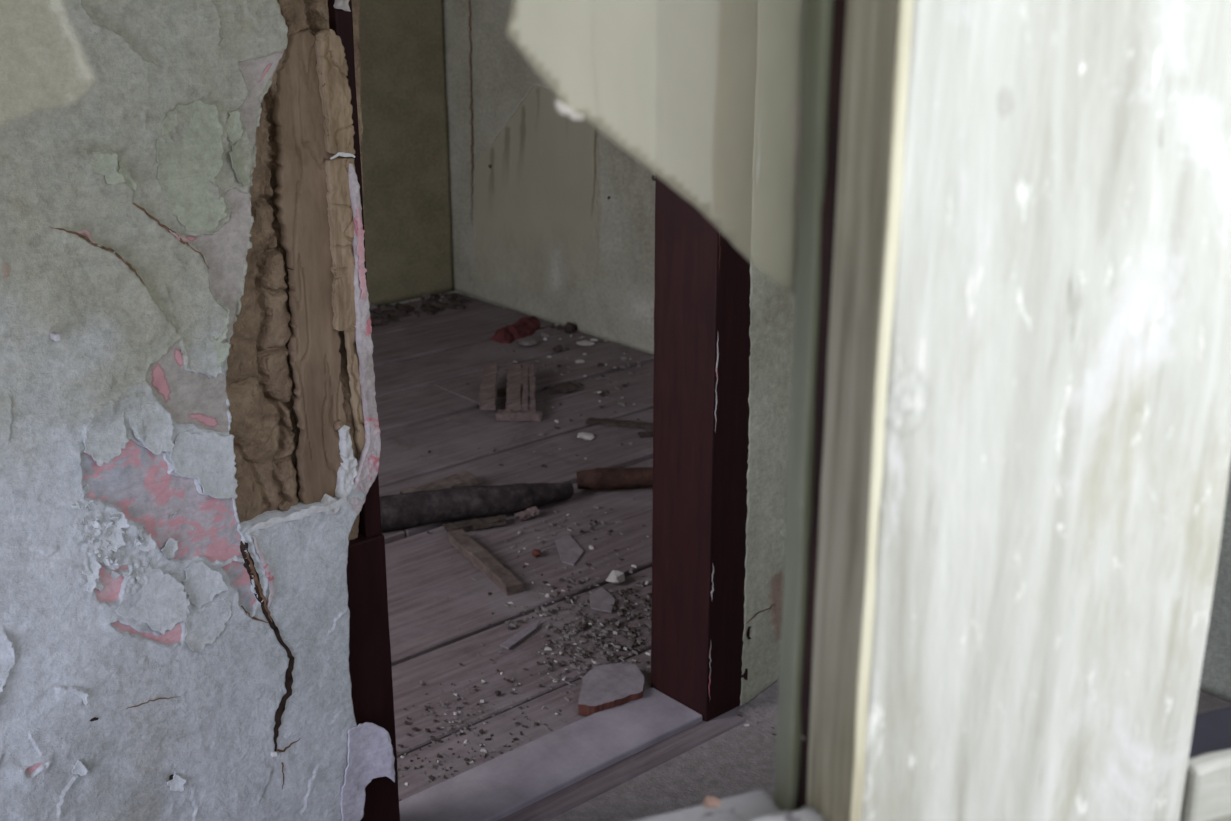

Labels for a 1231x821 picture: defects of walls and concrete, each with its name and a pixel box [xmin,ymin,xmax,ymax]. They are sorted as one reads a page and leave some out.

crack [466,0,474,222]
spalling [71,0,381,652]
crack [240,541,301,789]